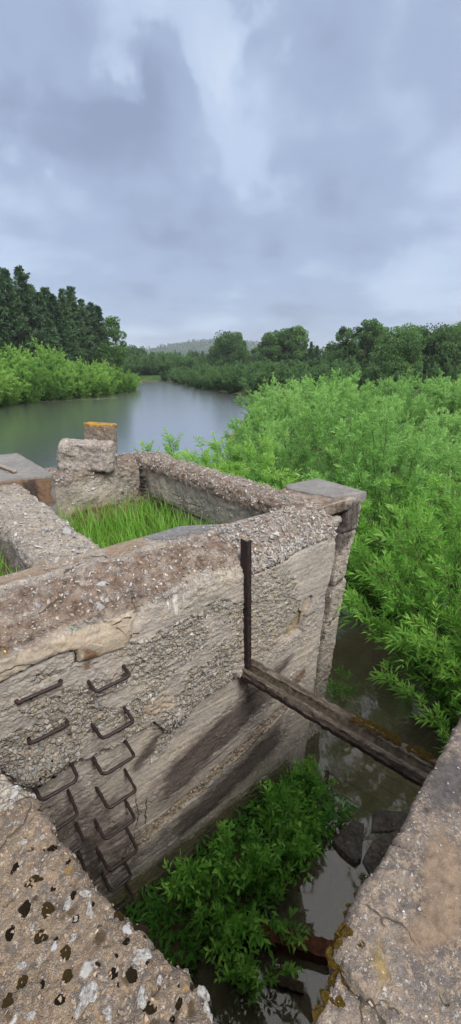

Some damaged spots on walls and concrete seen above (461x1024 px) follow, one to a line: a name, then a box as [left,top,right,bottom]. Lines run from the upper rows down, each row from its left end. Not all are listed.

spalling [0,527,338,812]
leakage [134,734,160,770]
leakage [162,688,272,797]
leakage [173,724,281,835]